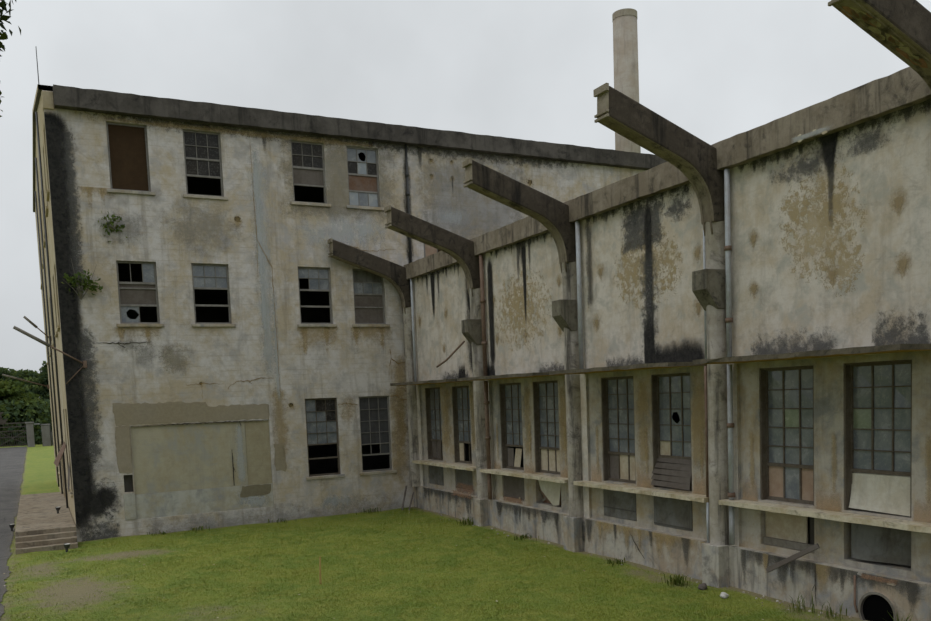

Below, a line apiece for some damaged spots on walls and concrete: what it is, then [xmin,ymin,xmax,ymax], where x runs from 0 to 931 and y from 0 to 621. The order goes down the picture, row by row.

damp [738,99,931,221]
damp [44,112,119,542]
damp [585,183,705,367]
damp [681,538,689,562]
damp [740,549,919,605]